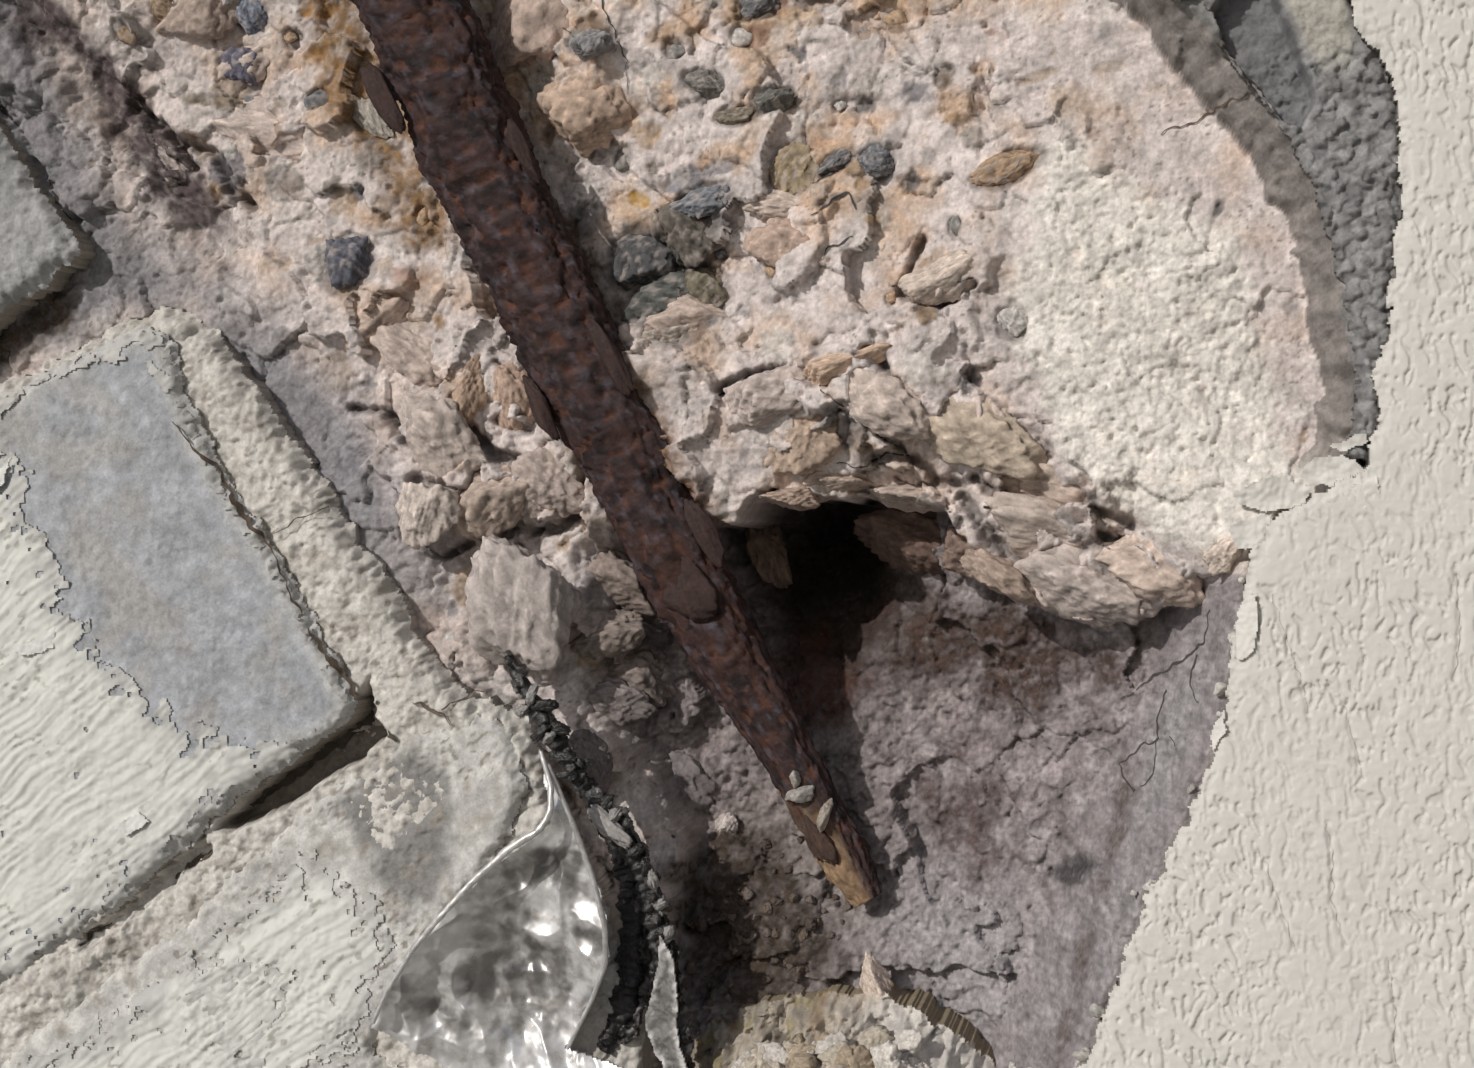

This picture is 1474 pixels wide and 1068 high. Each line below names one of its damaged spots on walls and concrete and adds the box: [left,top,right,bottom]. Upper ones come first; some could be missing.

spalling [536,75,633,157]
spalling [1203,0,1402,441]
spalling [898,248,975,307]
spalling [397,387,488,478]
spalling [511,447,585,521]
corrosion [316,0,882,908]
spalling [465,534,582,681]
spalling [1094,534,1206,608]
peeling [0,451,353,979]
crack [1119,609,1210,793]
crack [175,849,213,879]
crack [79,922,112,947]